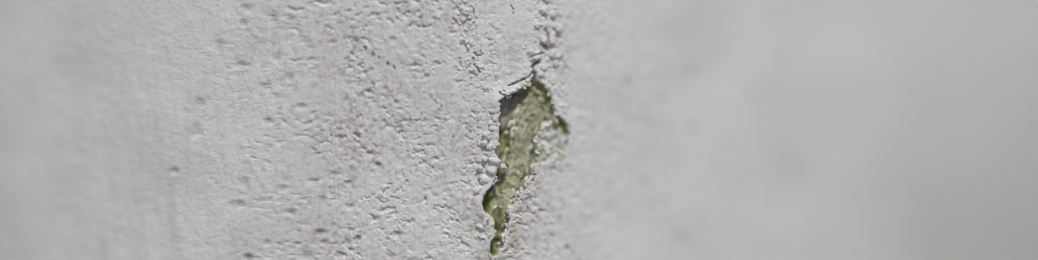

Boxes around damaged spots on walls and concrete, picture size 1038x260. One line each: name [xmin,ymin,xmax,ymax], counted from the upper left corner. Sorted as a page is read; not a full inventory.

peeling [473,79,570,260]